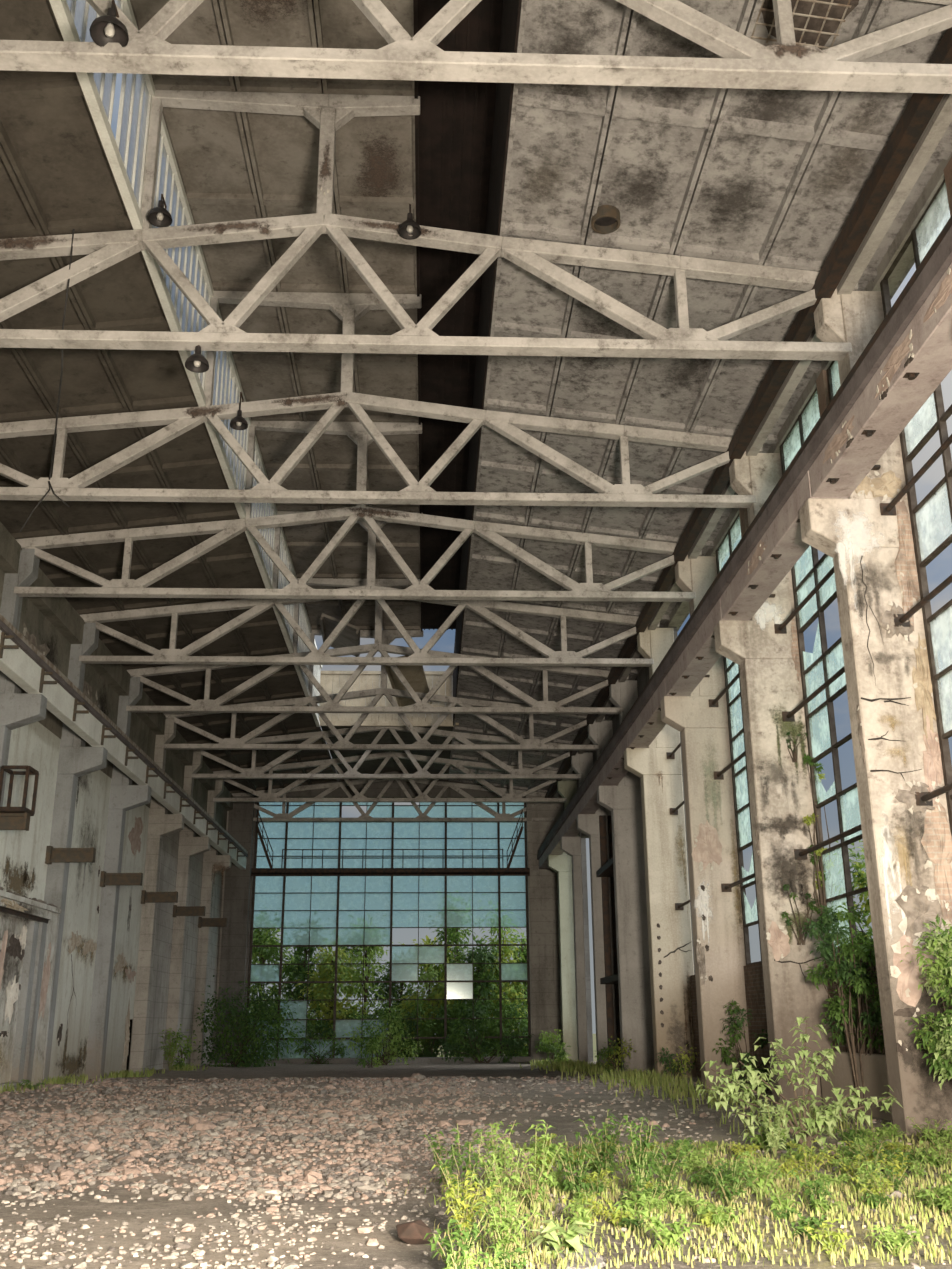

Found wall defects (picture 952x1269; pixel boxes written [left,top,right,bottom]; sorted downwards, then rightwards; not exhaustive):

water stain [527,167,559,199]
water stain [836,512,889,616]
water stain [870,653,909,674]
water stain [758,717,812,907]
spalling [855,470,952,1018]
peeling [0,899,28,1038]